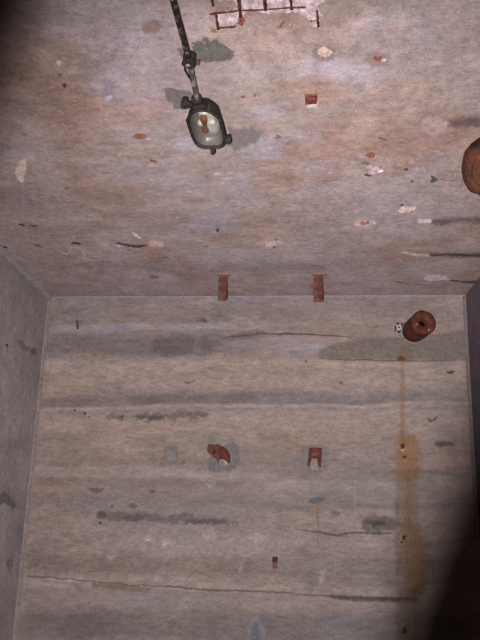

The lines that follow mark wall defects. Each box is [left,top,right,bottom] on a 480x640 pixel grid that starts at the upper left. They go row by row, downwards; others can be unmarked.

spalling [210,0,324,32]
leakage [192,37,234,62]
leakage [165,88,192,109]
spalling [363,162,385,177]
crack [222,331,352,339]
crack [297,529,392,537]
crack [27,575,415,602]